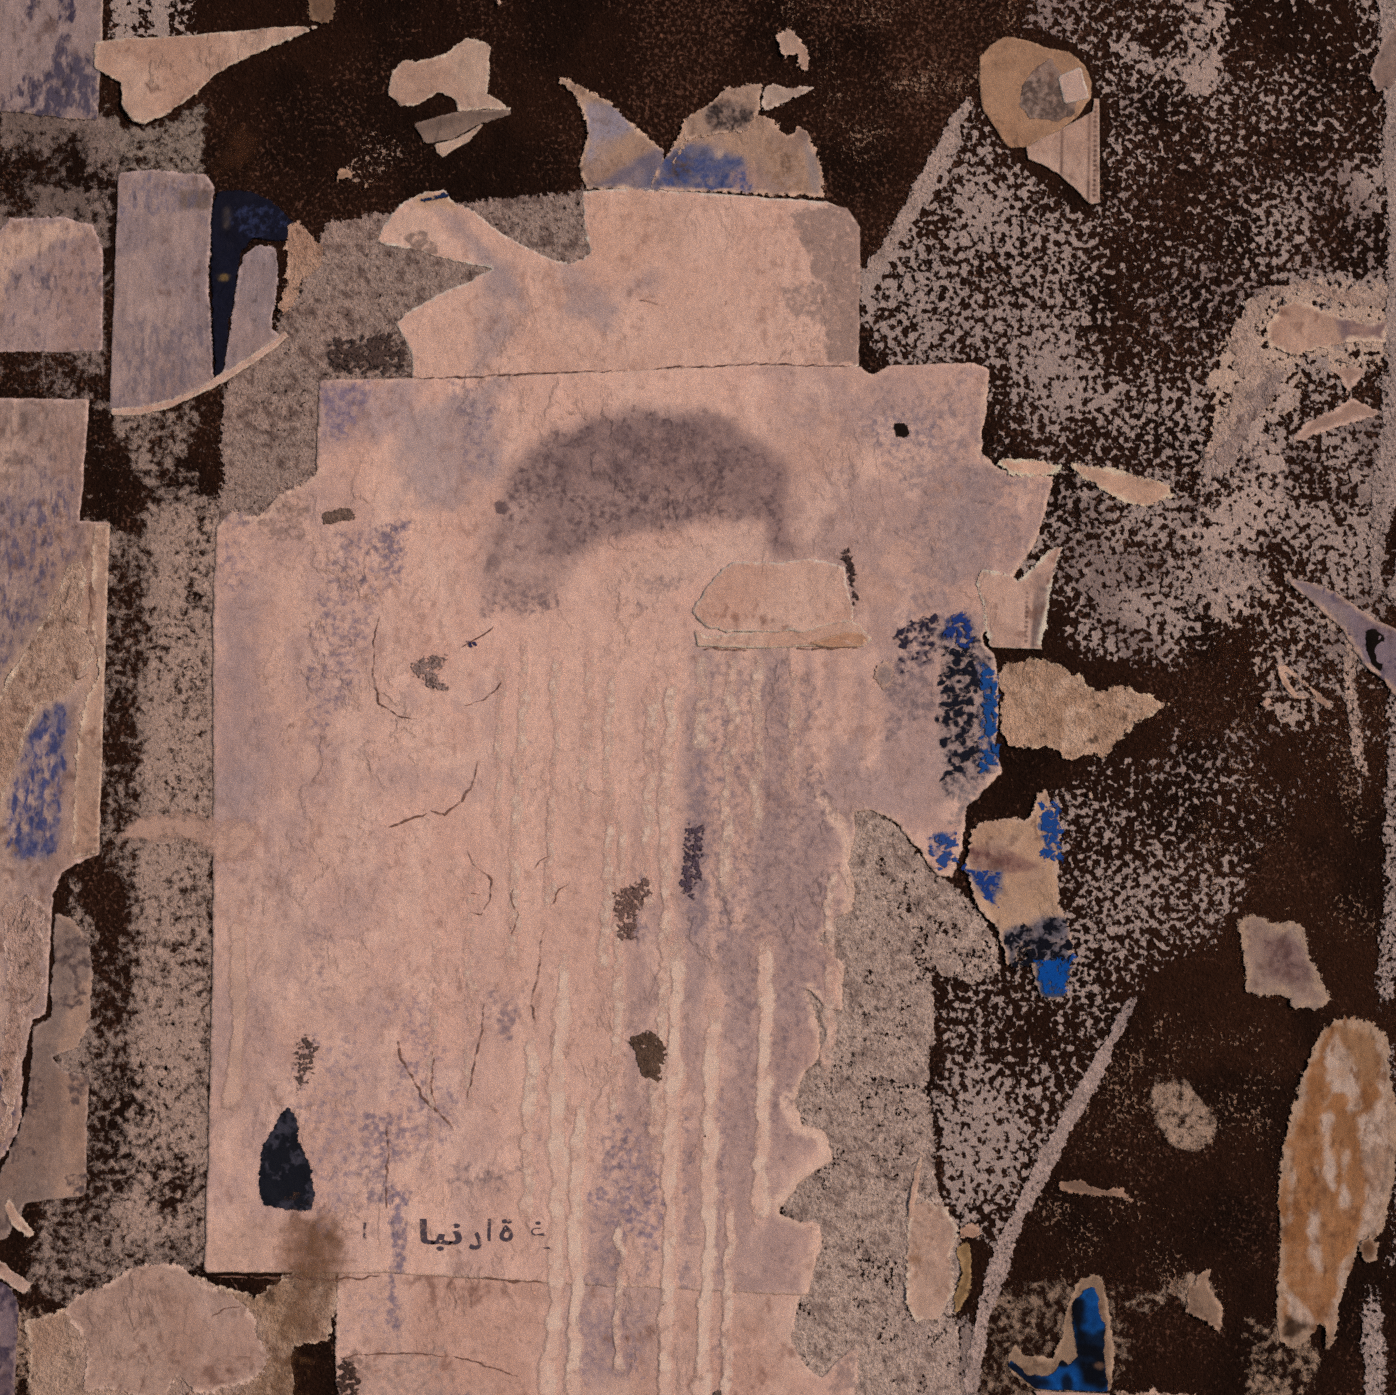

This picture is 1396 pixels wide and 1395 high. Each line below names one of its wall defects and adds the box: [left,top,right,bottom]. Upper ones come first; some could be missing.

water stain [519,950,588,1395]
water stain [578,651,765,1395]
water stain [750,942,776,1224]
water stain [820,873,838,1076]